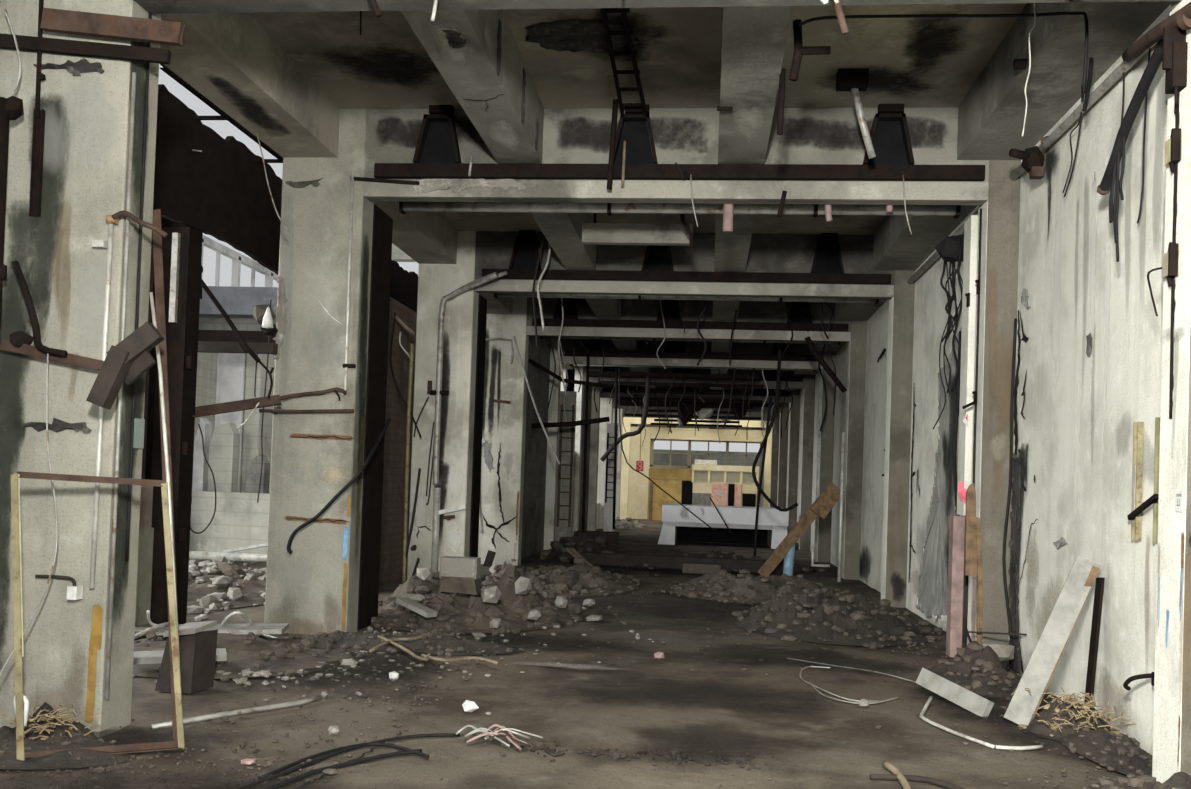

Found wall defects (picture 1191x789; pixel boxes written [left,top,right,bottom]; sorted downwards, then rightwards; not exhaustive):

spalling [33,58,104,76]
damp [0,98,69,648]
spalling [20,418,91,433]
rust [290,433,354,441]
peeling [915,327,962,623]
crack [482,444,516,549]
rust [285,516,348,524]